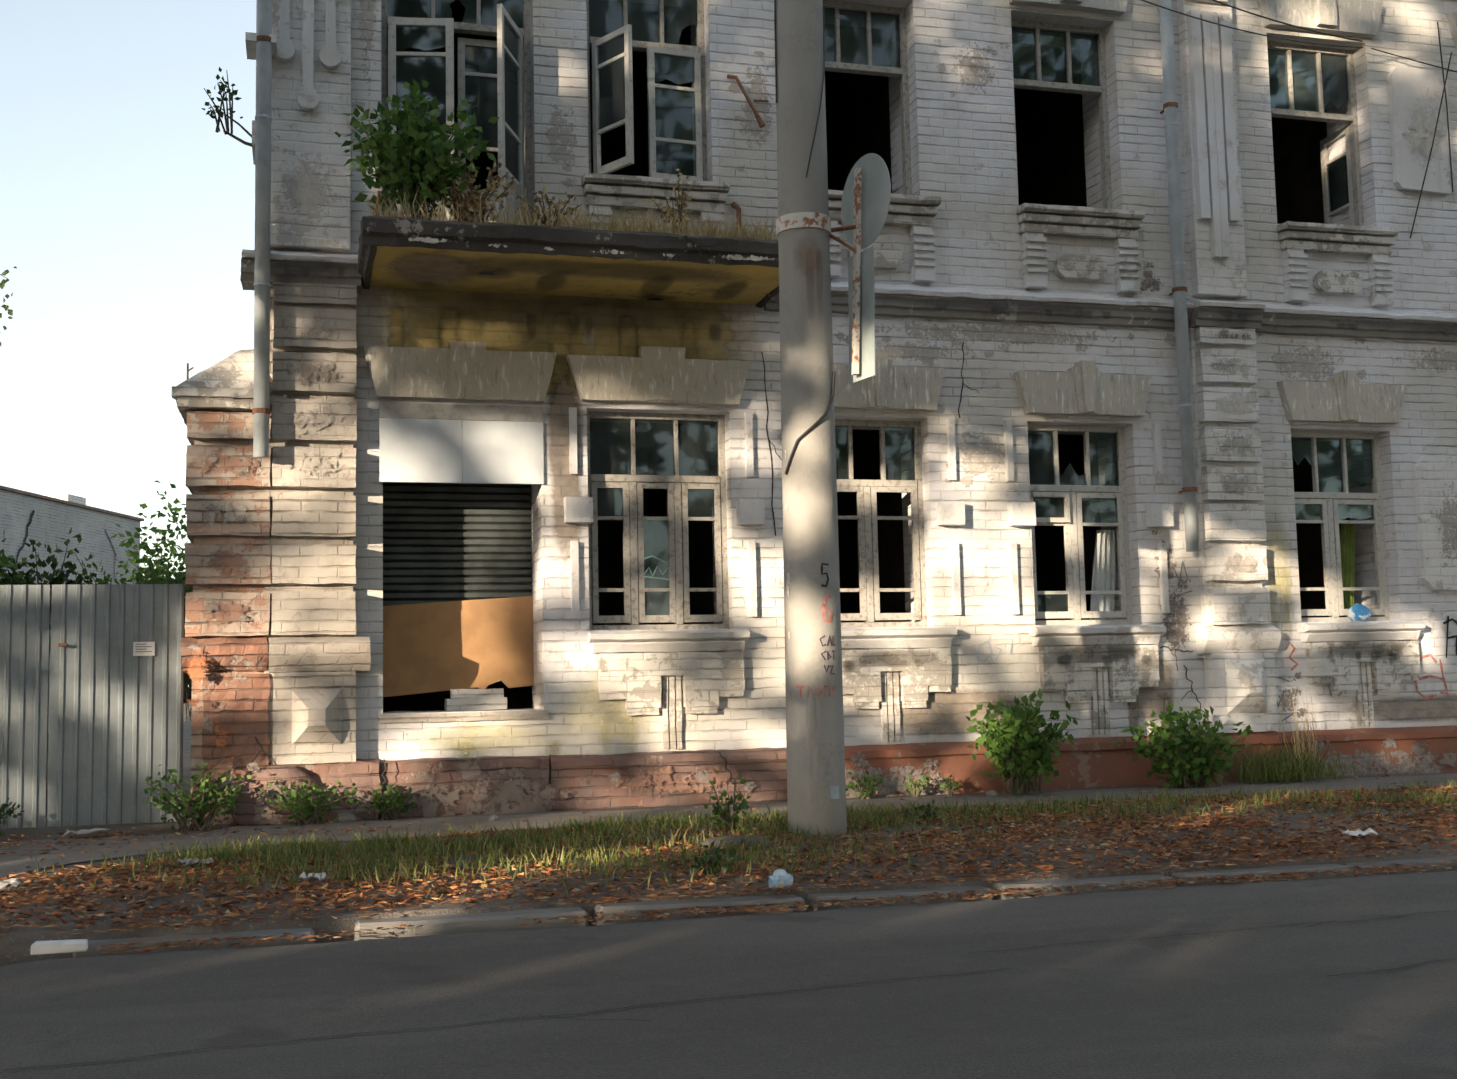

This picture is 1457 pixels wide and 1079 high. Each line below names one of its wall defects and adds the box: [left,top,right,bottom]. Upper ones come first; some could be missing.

crack [13,509,35,578]
spalling [186,649,209,706]
spalling [205,721,260,790]